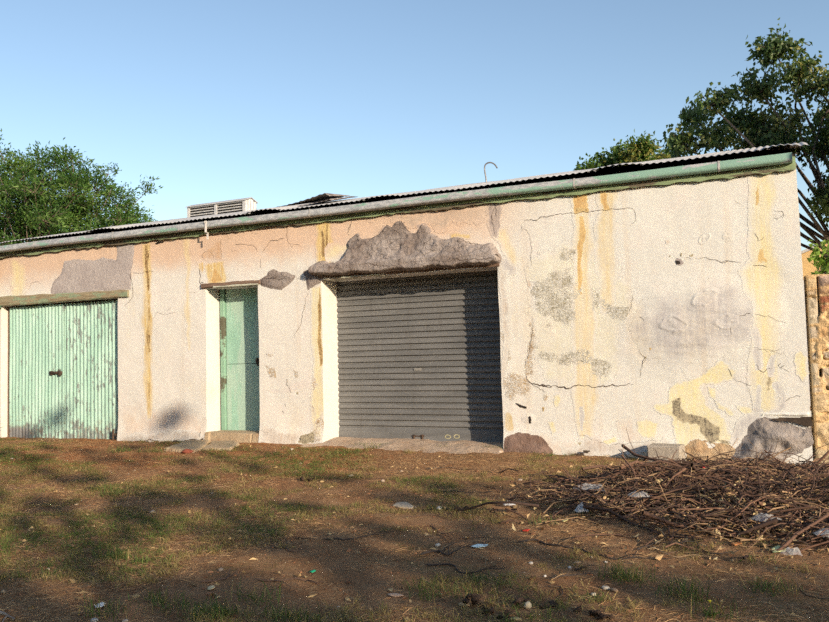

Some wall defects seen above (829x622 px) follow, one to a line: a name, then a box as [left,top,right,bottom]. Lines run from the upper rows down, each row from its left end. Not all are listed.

crack [525,319,646,390]
leakage [503,171,787,445]
peeling [636,360,753,462]